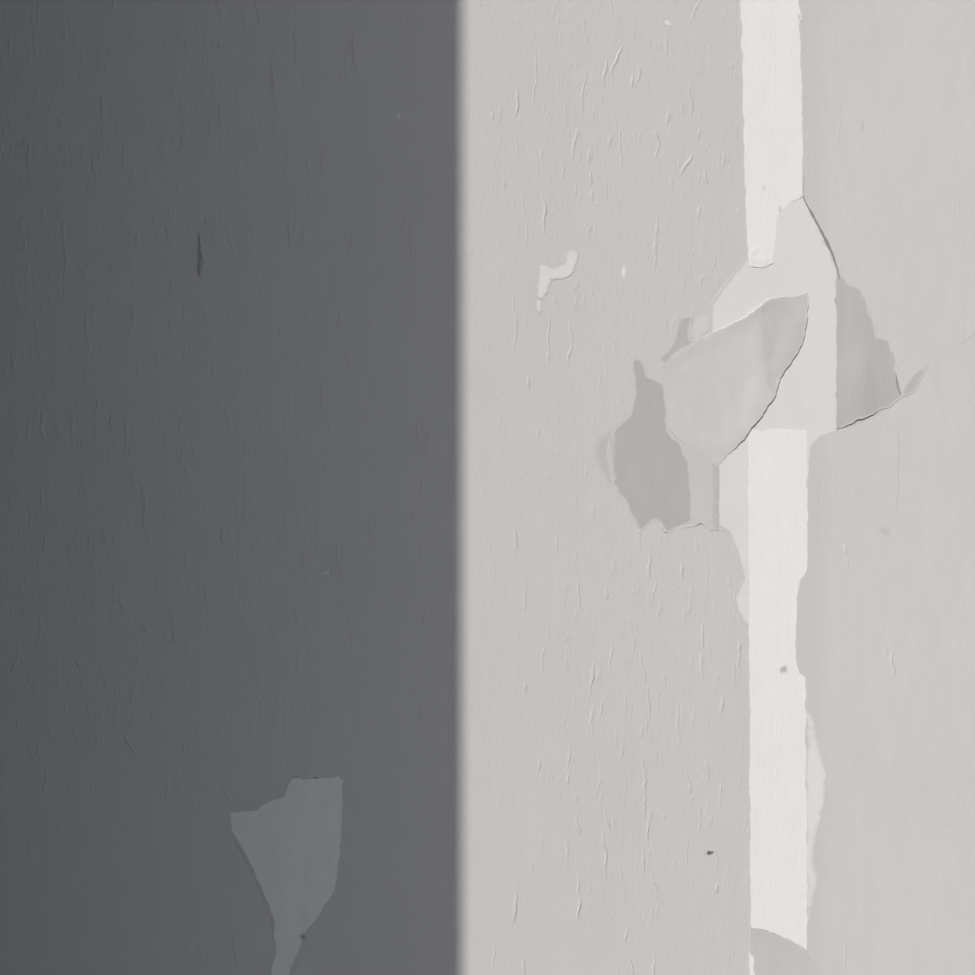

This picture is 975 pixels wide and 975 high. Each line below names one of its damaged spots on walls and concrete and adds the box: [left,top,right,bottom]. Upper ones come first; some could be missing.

peeling [536,248,578,314]
peeling [592,0,929,950]
peeling [230,774,346,975]